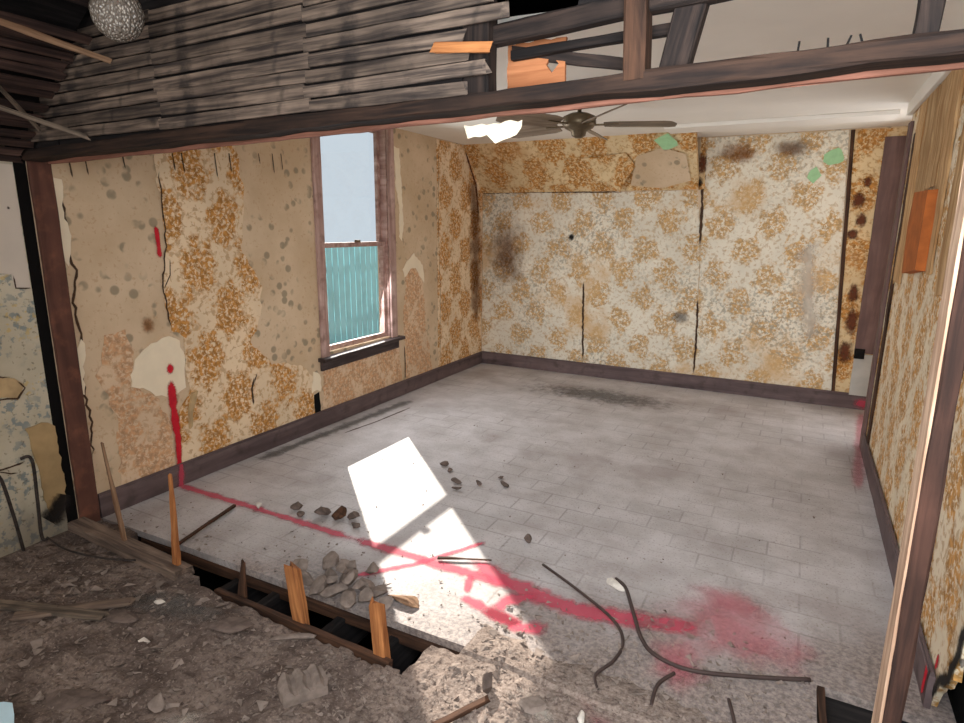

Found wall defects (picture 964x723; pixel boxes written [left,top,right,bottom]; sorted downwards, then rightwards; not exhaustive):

rust [847,177,871,239]
rust [838,285,859,362]
flaking render [0,377,26,401]
flaking render [131,336,186,397]
spalling [312,372,321,413]
flaking render [932,627,964,700]